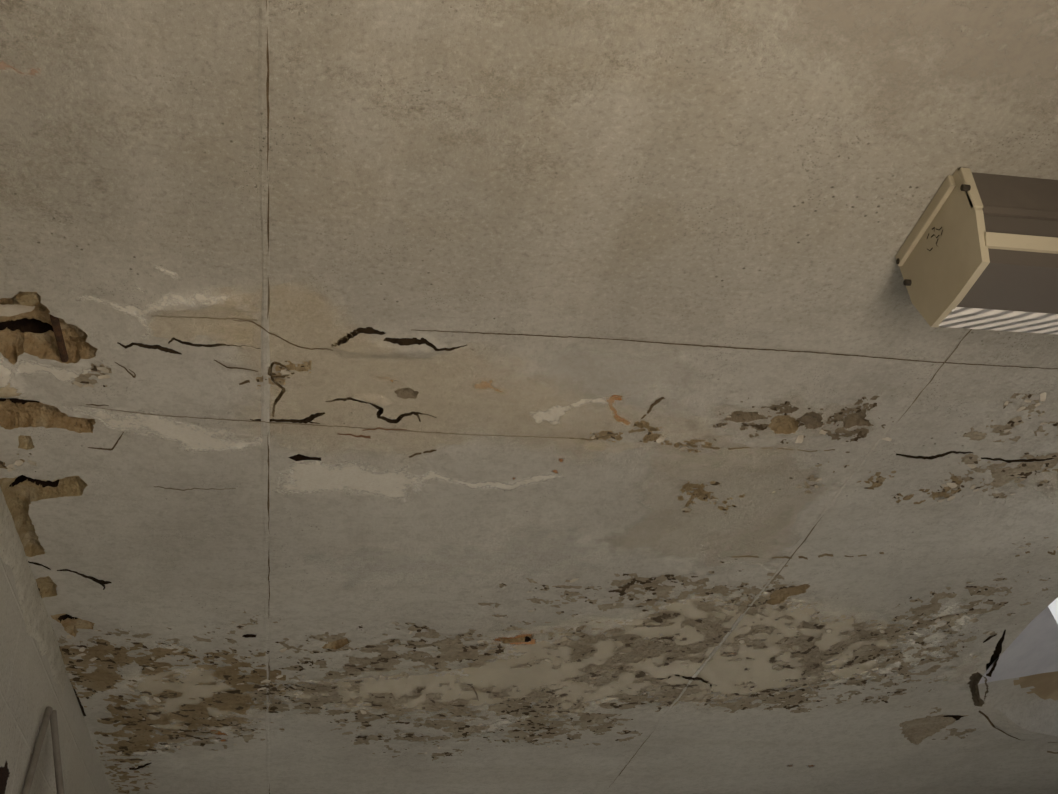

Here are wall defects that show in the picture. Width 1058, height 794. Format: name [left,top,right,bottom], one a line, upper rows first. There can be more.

spalling [0,291,112,388]
crack [79,316,1058,458]
peeling [963,392,1058,442]
spalling [0,398,96,557]
peeling [678,481,745,513]
spalling [587,396,896,494]
crack [896,451,1054,463]
peeling [892,452,1058,504]
spalling [35,576,57,598]
crack [28,561,111,598]
peeling [51,559,1050,794]